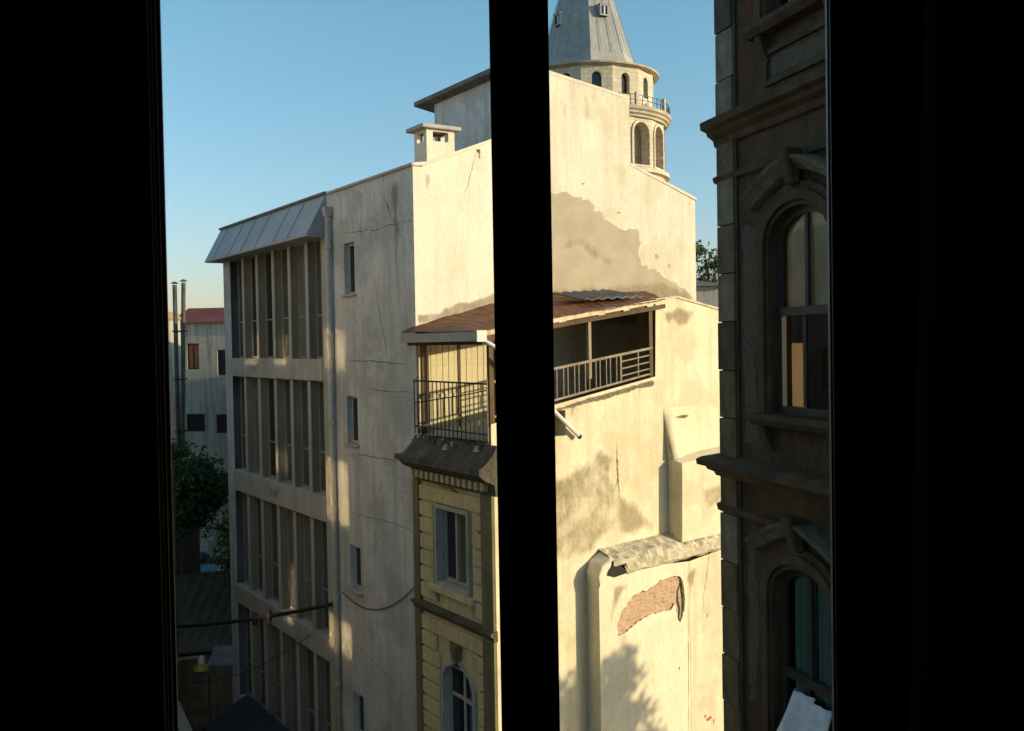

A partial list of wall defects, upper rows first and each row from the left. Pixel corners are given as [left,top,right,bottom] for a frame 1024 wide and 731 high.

flaking render [551,183,692,300]
flaking render [581,314,636,324]
leakage [556,472,588,500]
leakage [621,501,643,531]
flaking render [617,576,685,635]